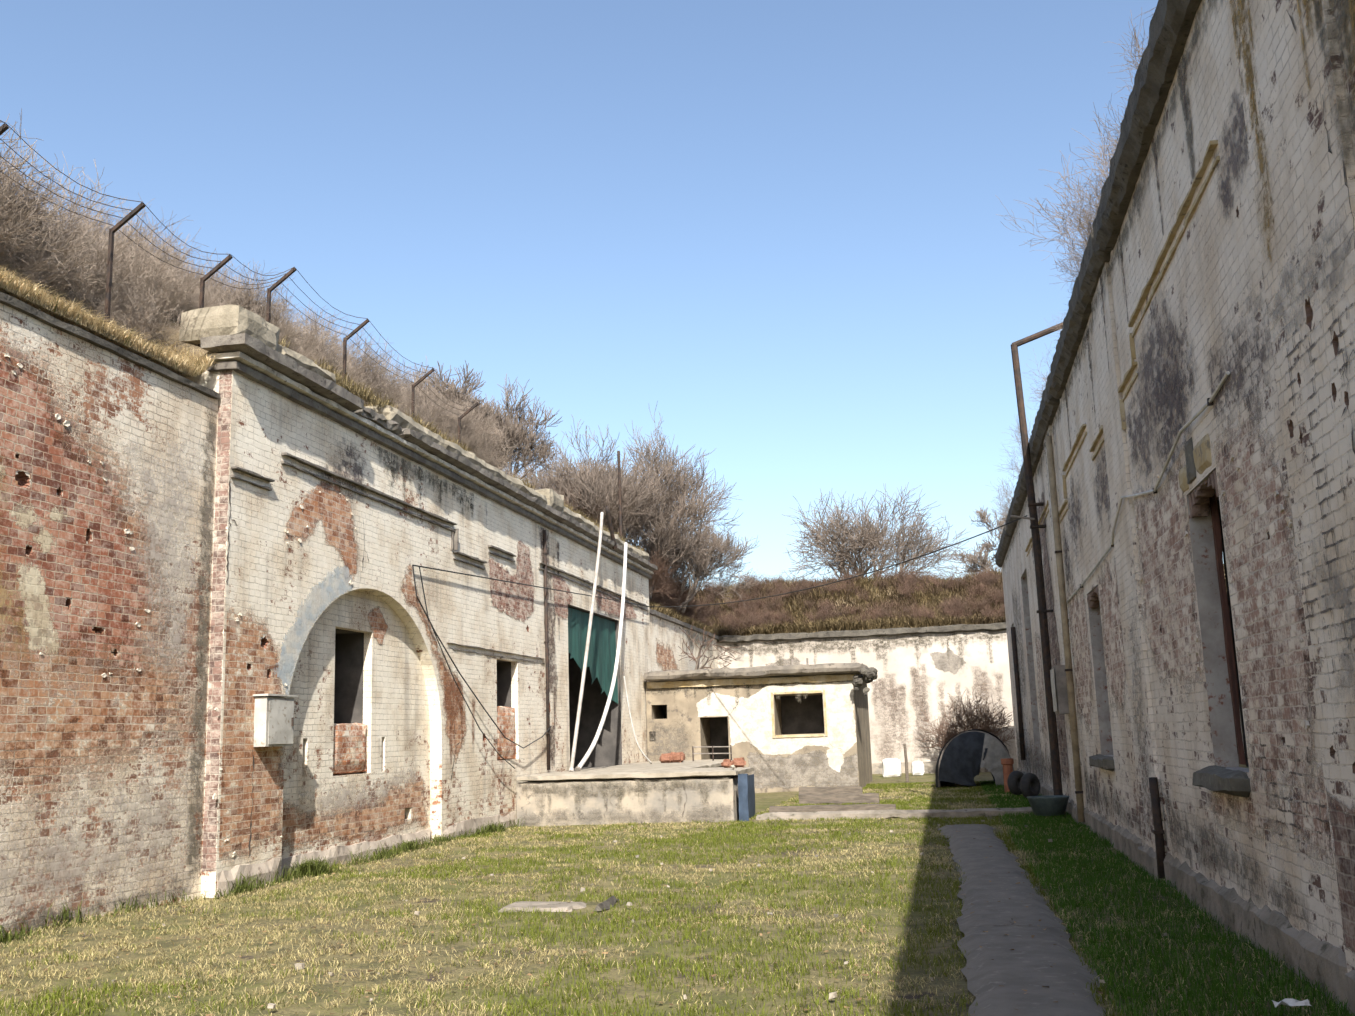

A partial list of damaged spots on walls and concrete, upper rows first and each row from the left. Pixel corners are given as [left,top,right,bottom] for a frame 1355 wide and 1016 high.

leakage [1035,0,1215,498]
leakage [1214,95,1248,213]
leakage [1316,0,1355,157]
crack [1322,95,1355,253]
leakage [1208,330,1268,425]
spalling [1331,383,1349,410]
crack [1338,315,1355,454]
peeling [0,332,428,872]
peeling [1032,493,1126,783]
peeling [1131,460,1204,699]
peeling [1207,396,1355,952]